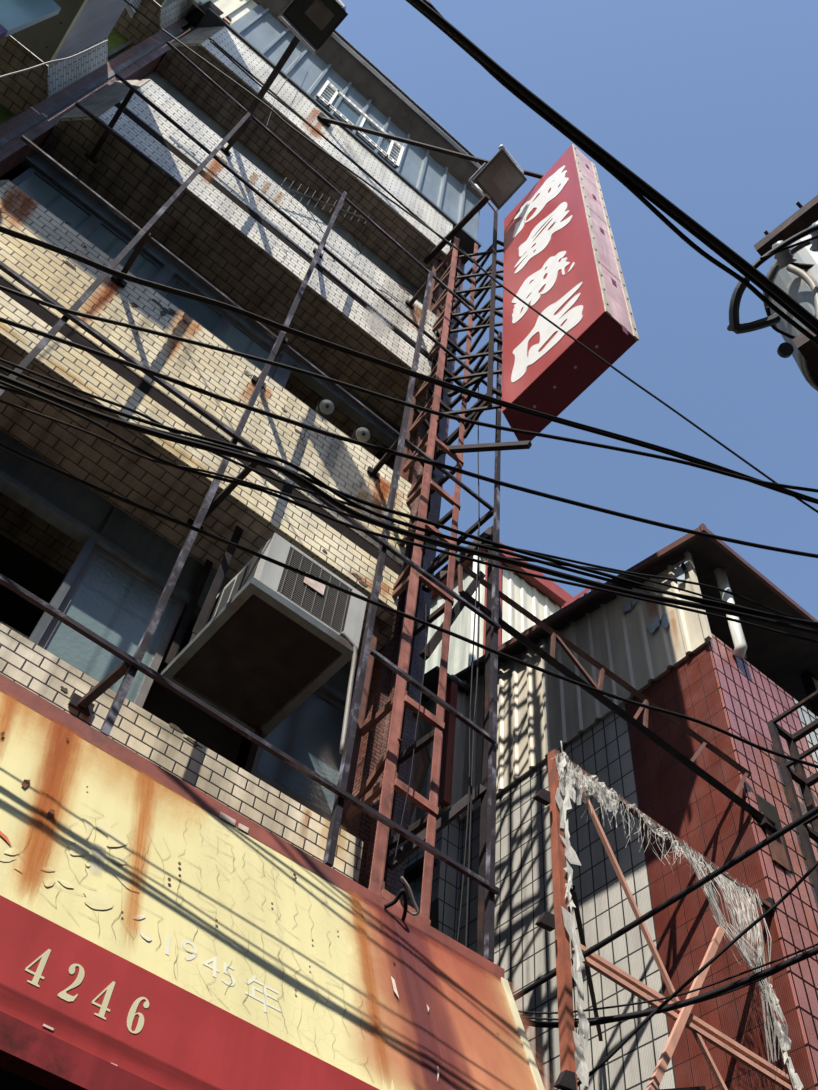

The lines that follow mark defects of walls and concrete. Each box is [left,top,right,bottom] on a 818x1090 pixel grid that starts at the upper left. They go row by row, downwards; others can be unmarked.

corrosion [23,726,82,881]
corrosion [127,772,154,930]
crack [18,791,374,1082]
corrosion [352,893,538,1090]